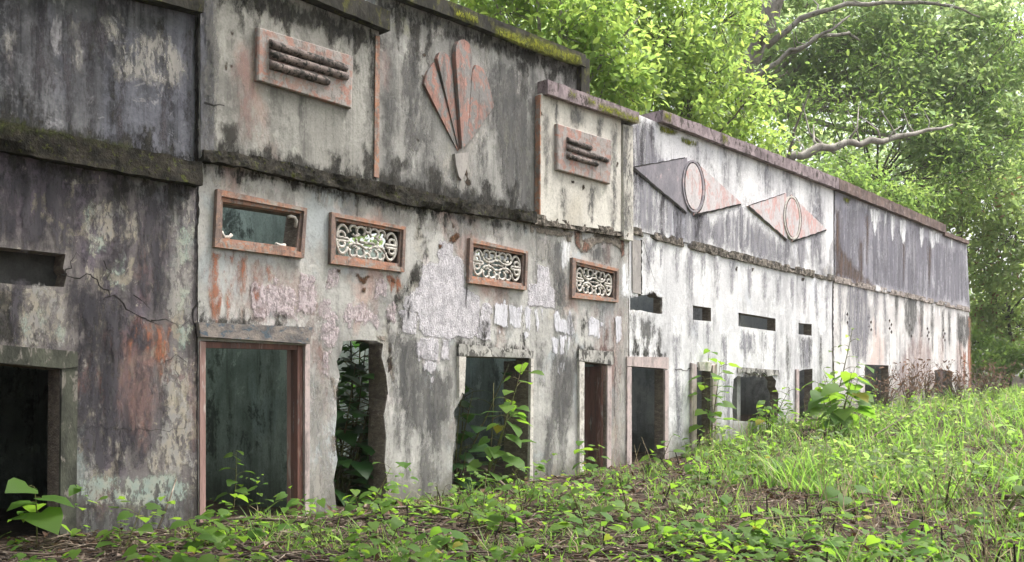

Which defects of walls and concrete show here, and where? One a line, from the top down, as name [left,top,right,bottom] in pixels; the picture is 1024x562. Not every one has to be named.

crack [61,187,200,501]
corrosion [209,251,270,318]
damp [0,0,577,512]
peeling [250,190,661,455]
damp [571,107,583,127]
damp [597,118,970,365]